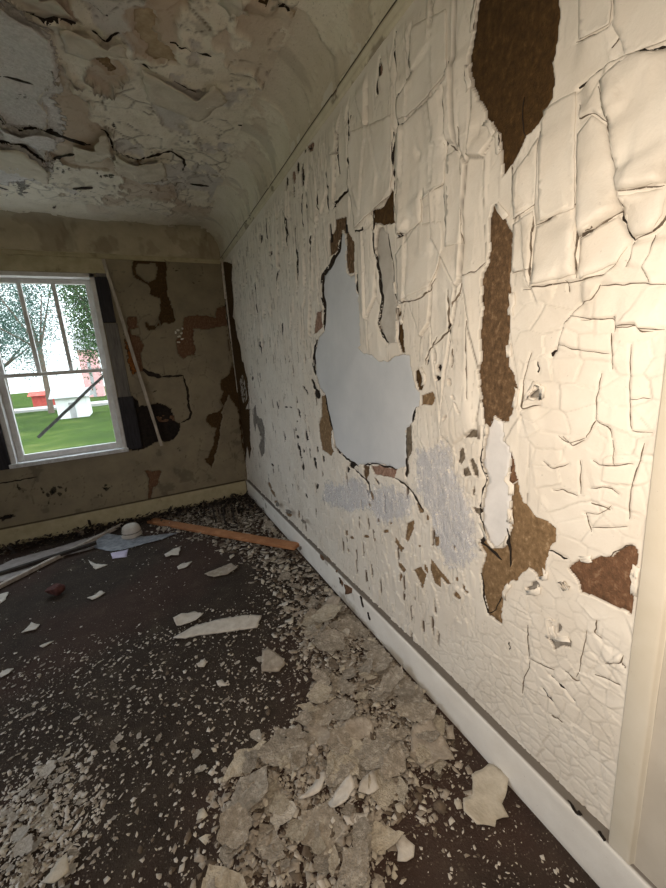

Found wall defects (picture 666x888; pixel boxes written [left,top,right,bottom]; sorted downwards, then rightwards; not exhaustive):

peeling [0,0,128,195]
crack [376,31,411,98]
crack [578,26,666,133]
peeling [73,136,168,184]
peeling [125,260,265,469]
peeling [277,114,435,507]
peeling [459,0,641,623]
peeling [365,503,429,552]
peeling [399,559,468,599]
crack [481,573,502,614]
crack [479,445,512,567]
crack [508,620,626,723]